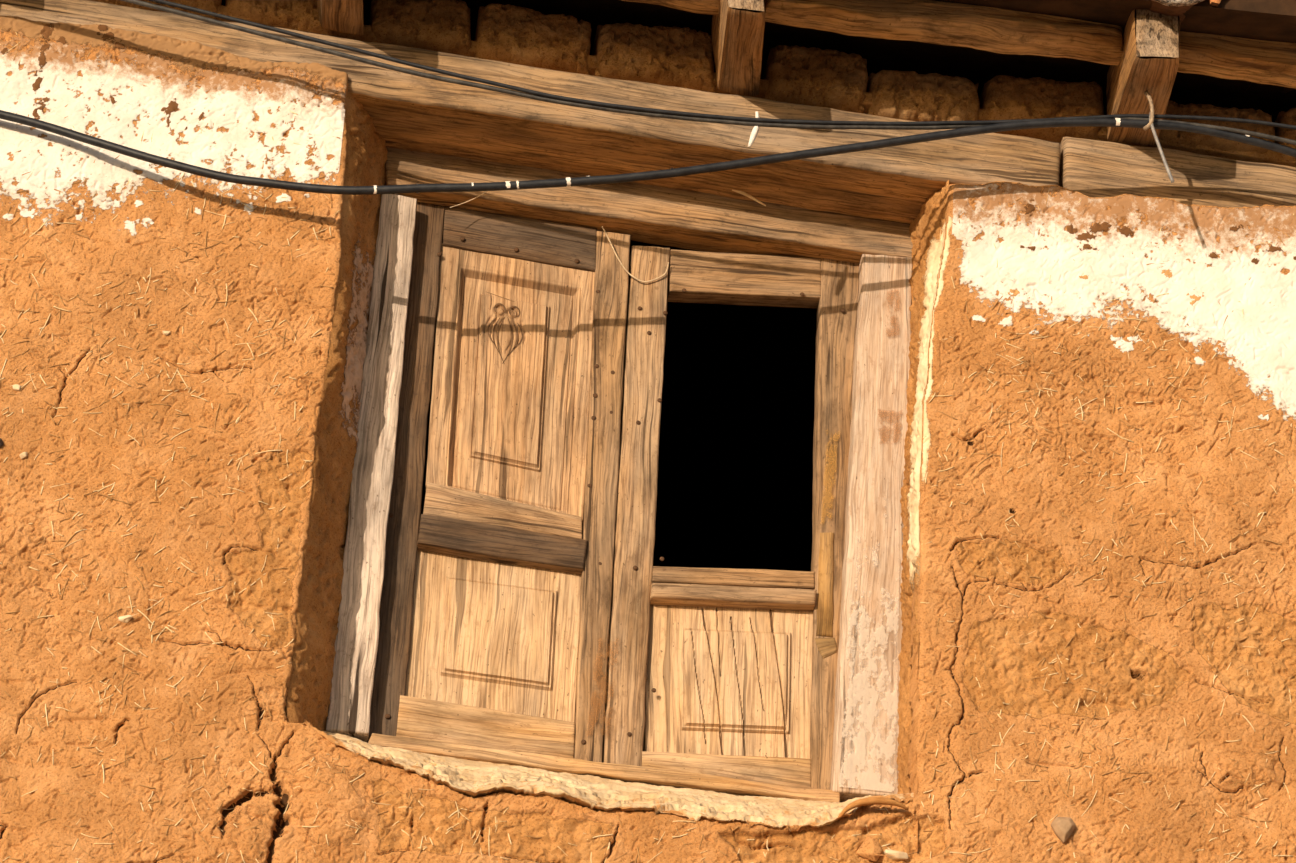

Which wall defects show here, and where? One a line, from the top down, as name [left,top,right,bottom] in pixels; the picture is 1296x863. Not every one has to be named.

peeling [0,30,348,236]
peeling [907,183,1296,588]
crack [163,631,307,863]
peeling [840,585,899,792]
crack [947,537,1071,829]
spalling [963,612,1193,719]
crack [1139,544,1256,576]
crack [1198,752,1243,794]
spalling [1192,602,1296,724]
crack [1278,737,1286,790]